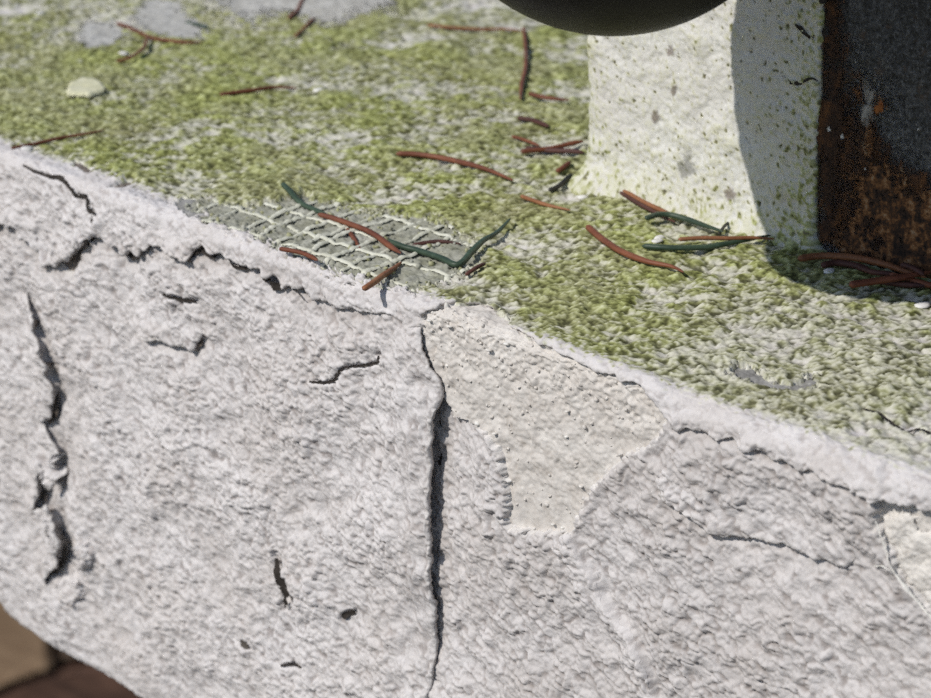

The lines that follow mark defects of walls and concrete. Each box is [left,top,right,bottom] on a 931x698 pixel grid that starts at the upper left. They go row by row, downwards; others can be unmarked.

corrosion [816,0,931,279]
crack [22,165,95,247]
crack [309,356,380,384]
spalling [0,194,931,618]
crack [863,408,931,434]